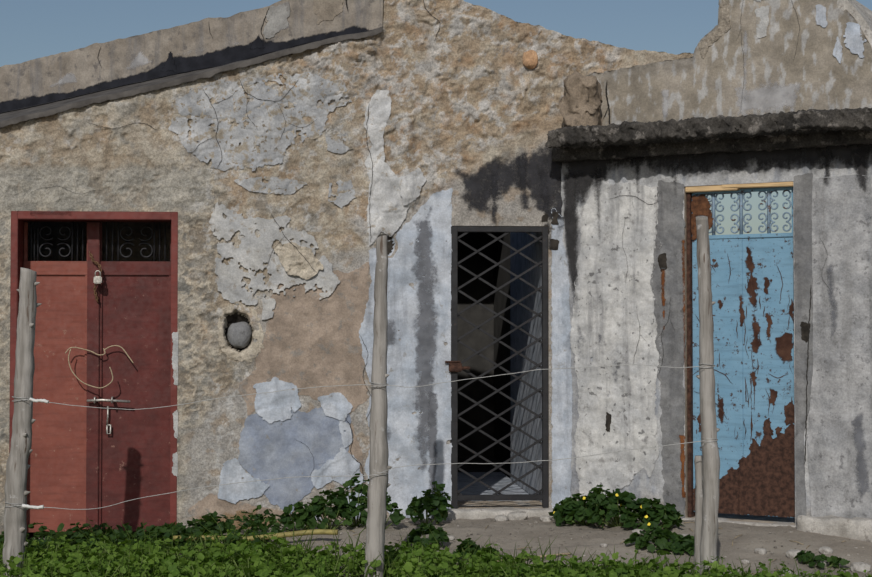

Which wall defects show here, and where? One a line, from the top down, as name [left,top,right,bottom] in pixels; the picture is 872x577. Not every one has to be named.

spalling [698,0,731,58]
peeling [755,0,770,39]
peeling [816,4,828,28]
peeling [833,22,867,64]
peeling [168,72,353,195]
crack [602,82,610,124]
leakage [457,144,872,290]
peeling [188,90,453,527]
corrosion [682,194,713,358]
corrosion [718,247,795,518]
corrosion [679,435,695,511]